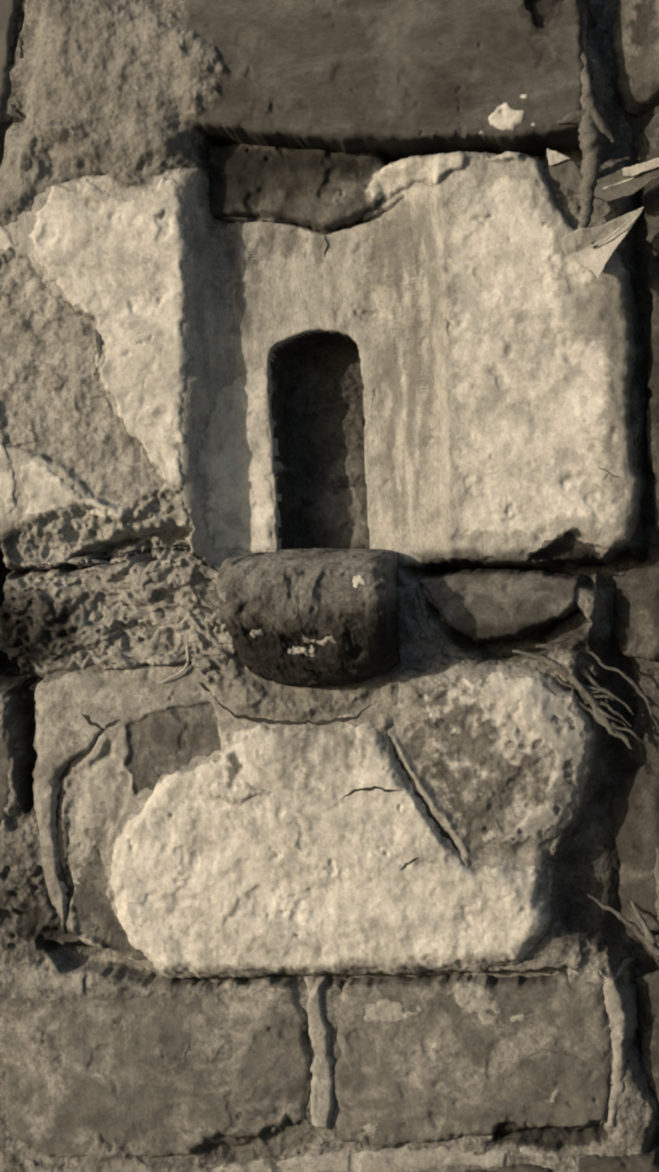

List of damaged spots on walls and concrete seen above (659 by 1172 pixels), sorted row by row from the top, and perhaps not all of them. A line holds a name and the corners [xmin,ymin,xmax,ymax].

water stain [206,153,372,328]
water stain [319,455,365,543]
crack [55,714,120,922]